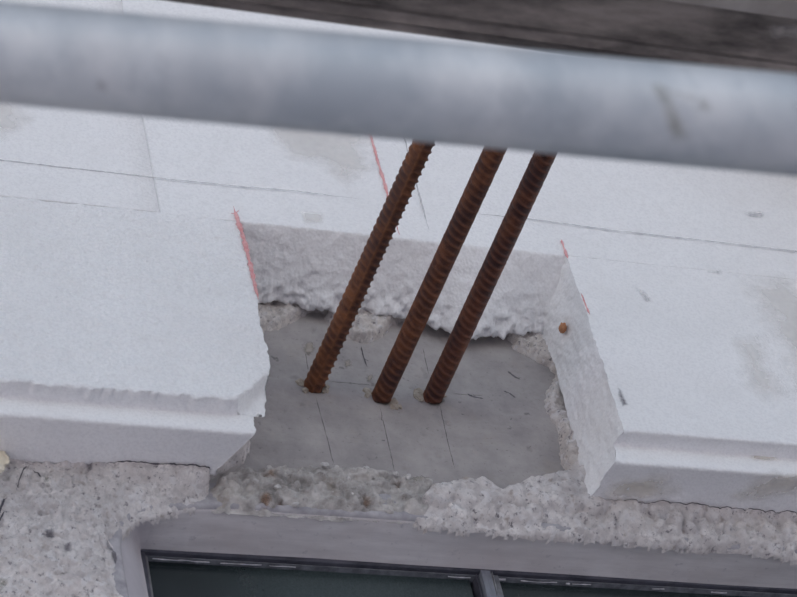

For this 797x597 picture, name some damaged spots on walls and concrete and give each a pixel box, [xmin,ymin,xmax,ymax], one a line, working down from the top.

spalling [210,462,433,524]
spalling [258,141,506,403]
spalling [423,153,556,404]
flaking render [506,332,579,470]